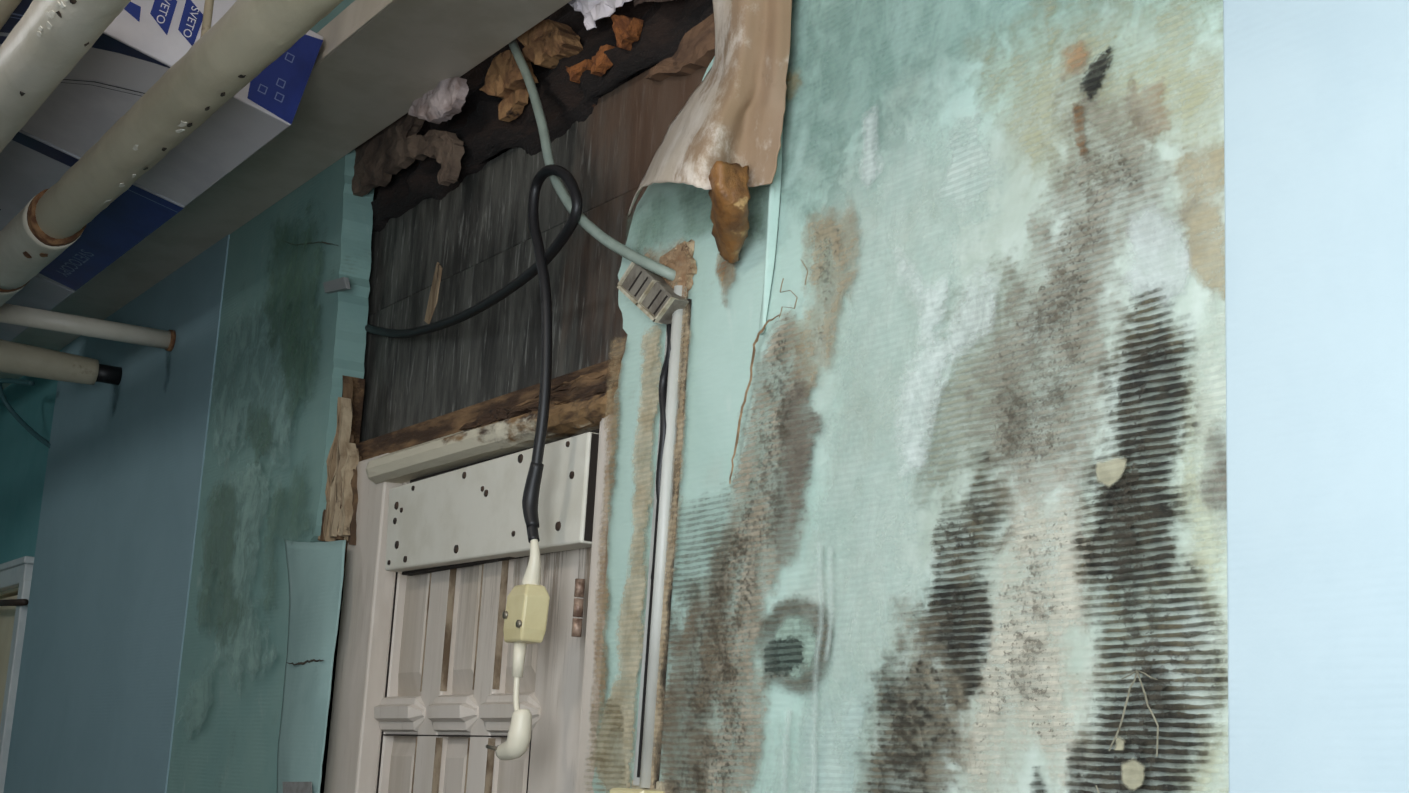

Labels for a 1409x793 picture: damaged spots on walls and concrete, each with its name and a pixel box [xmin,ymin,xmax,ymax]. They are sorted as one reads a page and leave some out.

flaking render [351,77,469,197]
rust [27,189,87,246]
crack [779,259,808,318]
damp [660,0,1228,793]
damp [185,307,299,733]